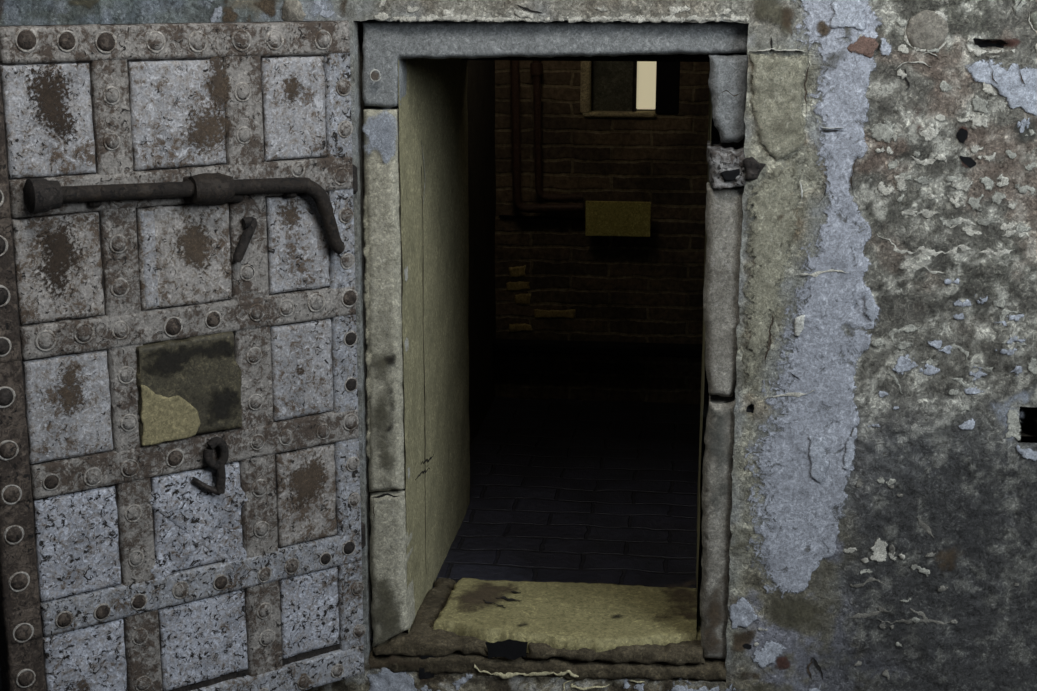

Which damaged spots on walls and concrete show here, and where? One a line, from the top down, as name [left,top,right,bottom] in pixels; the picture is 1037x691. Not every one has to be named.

flaking render [208,0,222,22]
rust [17,61,80,151]
rust [173,56,238,159]
rust [278,69,304,110]
rust [27,213,95,305]
rust [170,215,212,281]
flaking render [743,0,1037,598]
rust [53,363,92,418]
damp [456,583,522,612]
flaking render [729,596,786,668]
flaking render [851,598,958,631]
peeling [367,667,440,691]